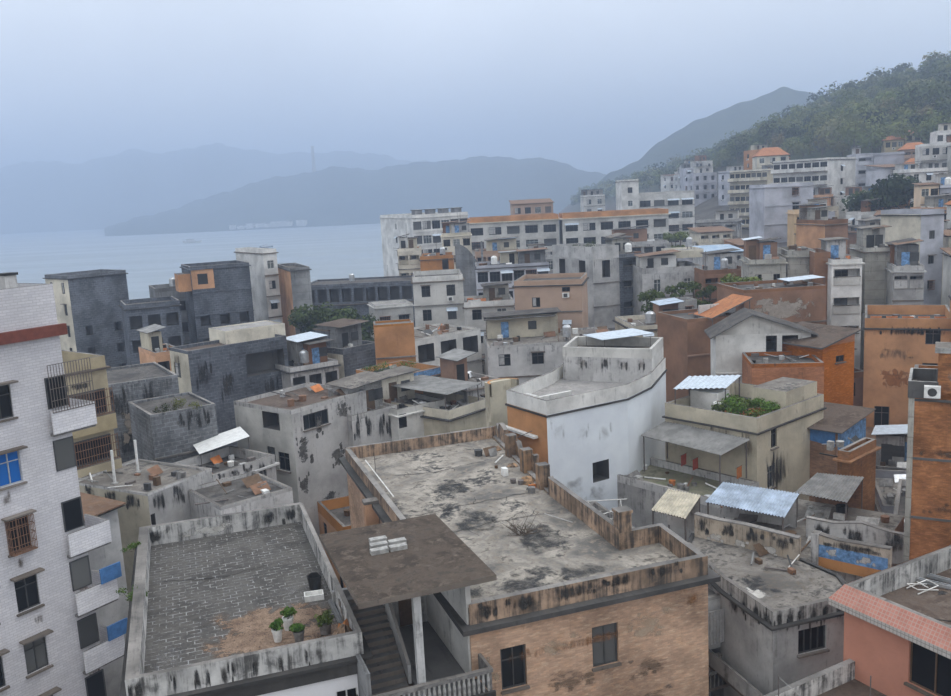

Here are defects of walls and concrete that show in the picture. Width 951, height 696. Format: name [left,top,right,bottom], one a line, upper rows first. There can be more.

leakage [179,408,210,430]
leakage [354,413,392,440]
leakage [264,510,295,525]
leakage [746,528,793,549]
leakage [651,562,682,577]
leakage [560,574,629,599]
leakage [478,596,534,619]
leakage [128,683,142,696]
leakage [194,670,211,689]
leakage [221,663,236,683]